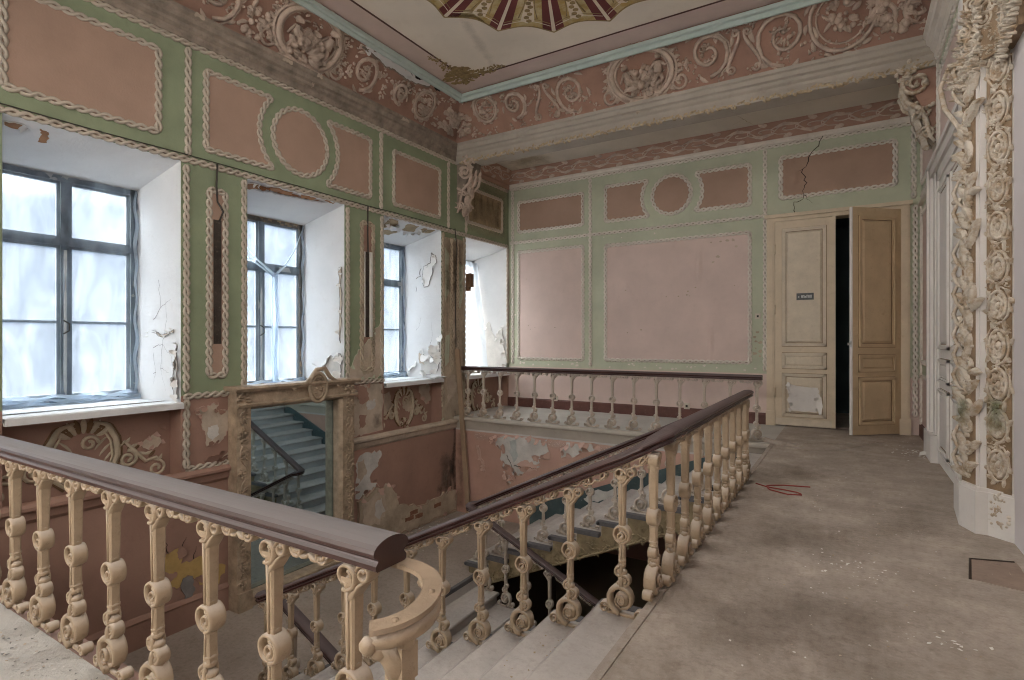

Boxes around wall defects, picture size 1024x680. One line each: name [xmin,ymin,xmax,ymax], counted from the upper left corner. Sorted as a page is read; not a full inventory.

peeling [3,120,49,143]
crack [793,136,823,212]
spalling [312,217,464,437]
peeling [484,321,534,367]
peeling [195,401,228,463]
spalling [355,450,457,533]
peeling [488,435,601,486]
peeling [165,539,203,599]